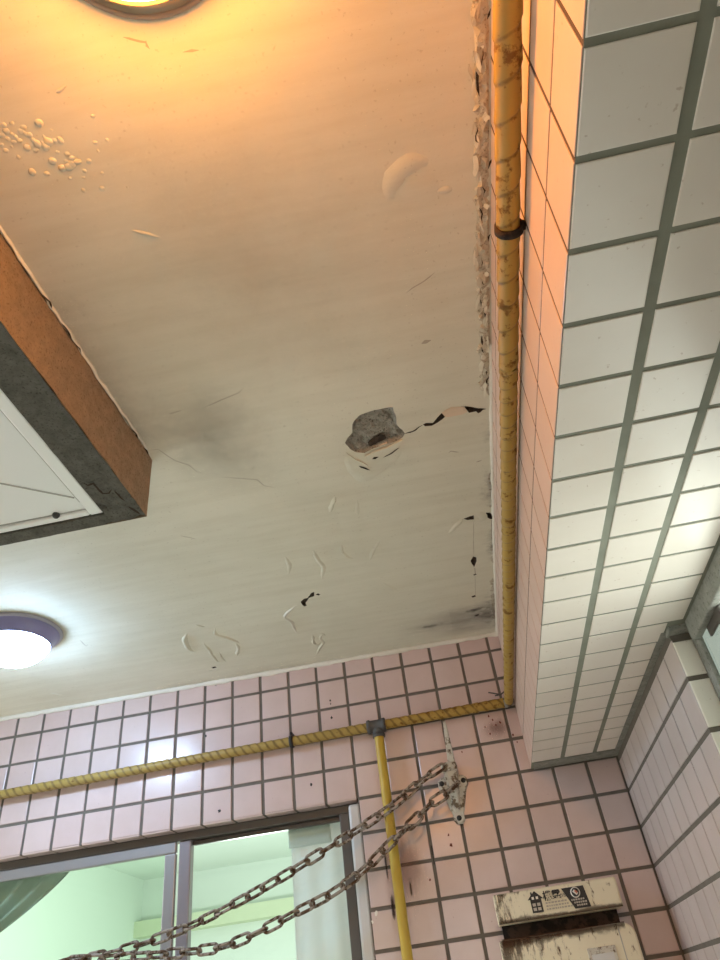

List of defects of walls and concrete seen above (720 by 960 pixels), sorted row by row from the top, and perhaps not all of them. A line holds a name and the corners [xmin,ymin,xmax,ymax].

flaking render [468,0,492,398]
crack [405,406,485,434]
spalling [344,407,405,481]
crack [448,512,492,549]
peeling [283,592,320,633]